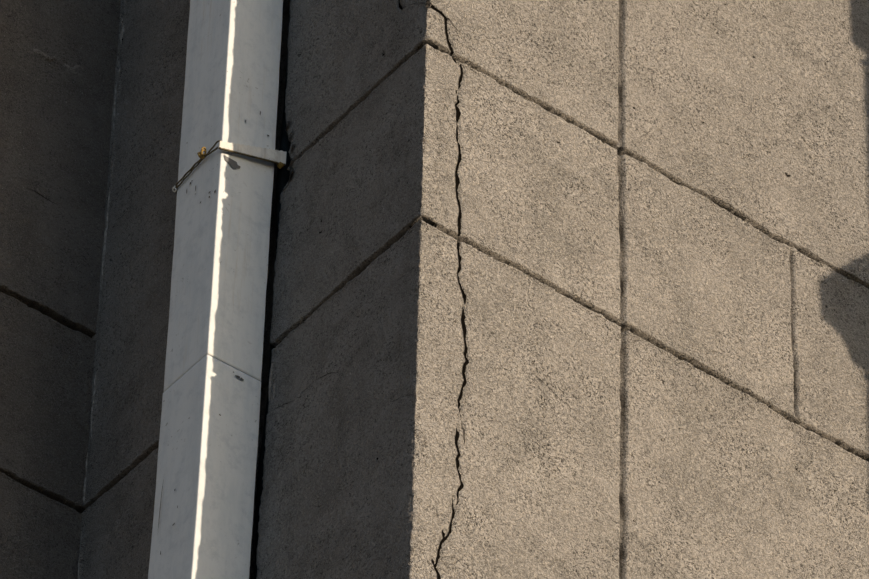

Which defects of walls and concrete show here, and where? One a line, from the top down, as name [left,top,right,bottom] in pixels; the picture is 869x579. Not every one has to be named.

crack [399,0,469,579]